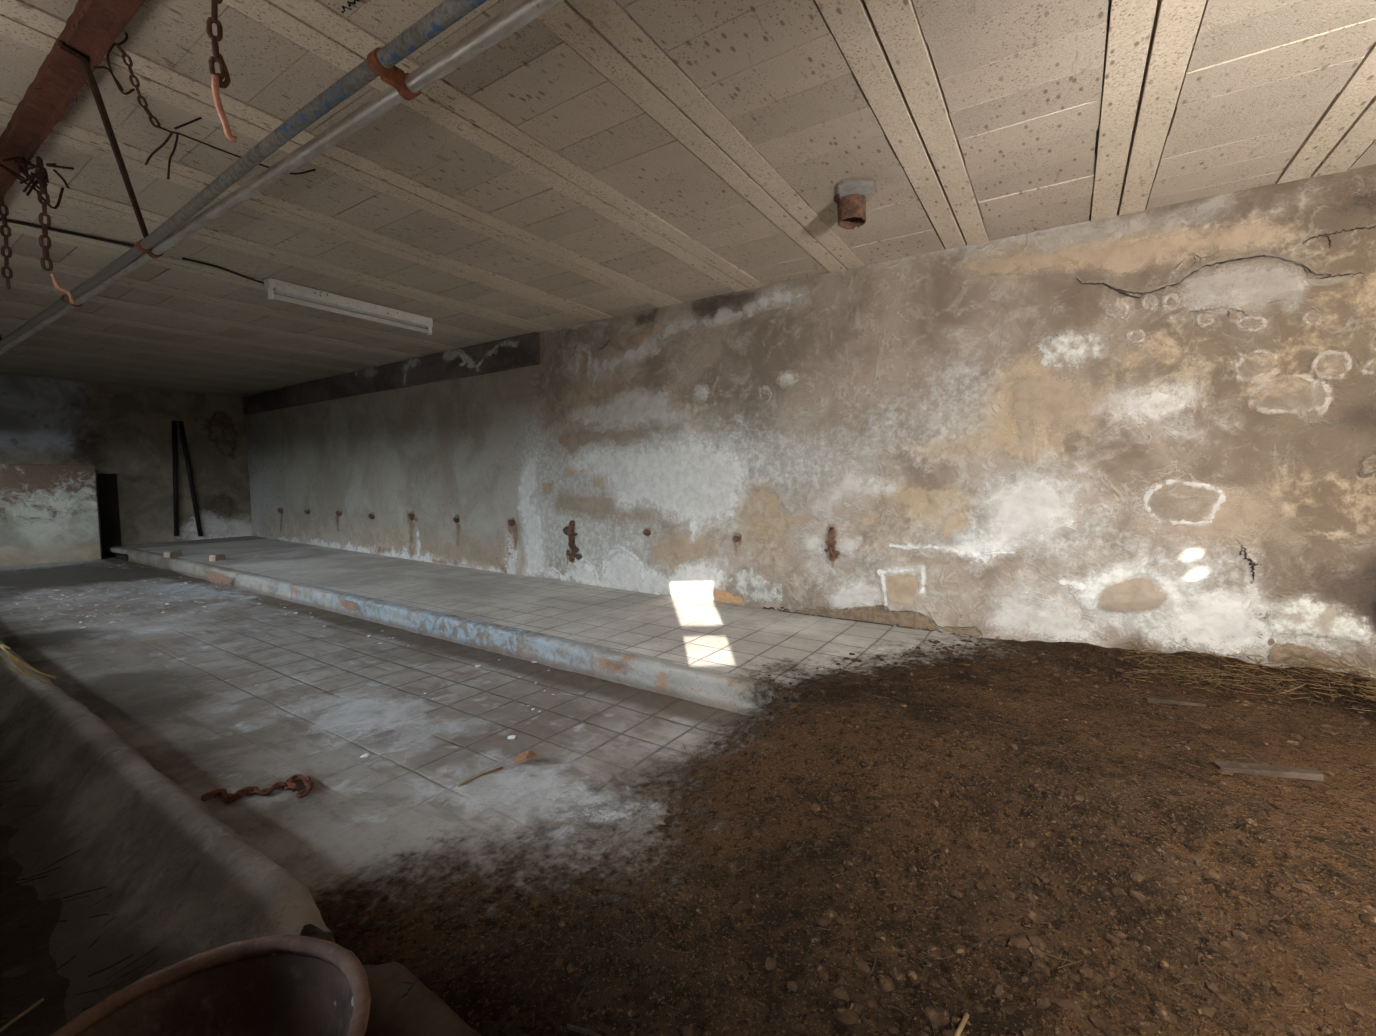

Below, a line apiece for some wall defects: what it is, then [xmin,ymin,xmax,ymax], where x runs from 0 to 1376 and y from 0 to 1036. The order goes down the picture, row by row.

water stain [693,291,755,322]
crack [1076,225,1376,319]
water stain [1011,330,1104,462]
water stain [268,412,810,603]
water stain [877,512,1015,605]
water stain [1059,562,1176,603]
water stain [1156,487,1273,542]
water stain [1266,574,1376,646]